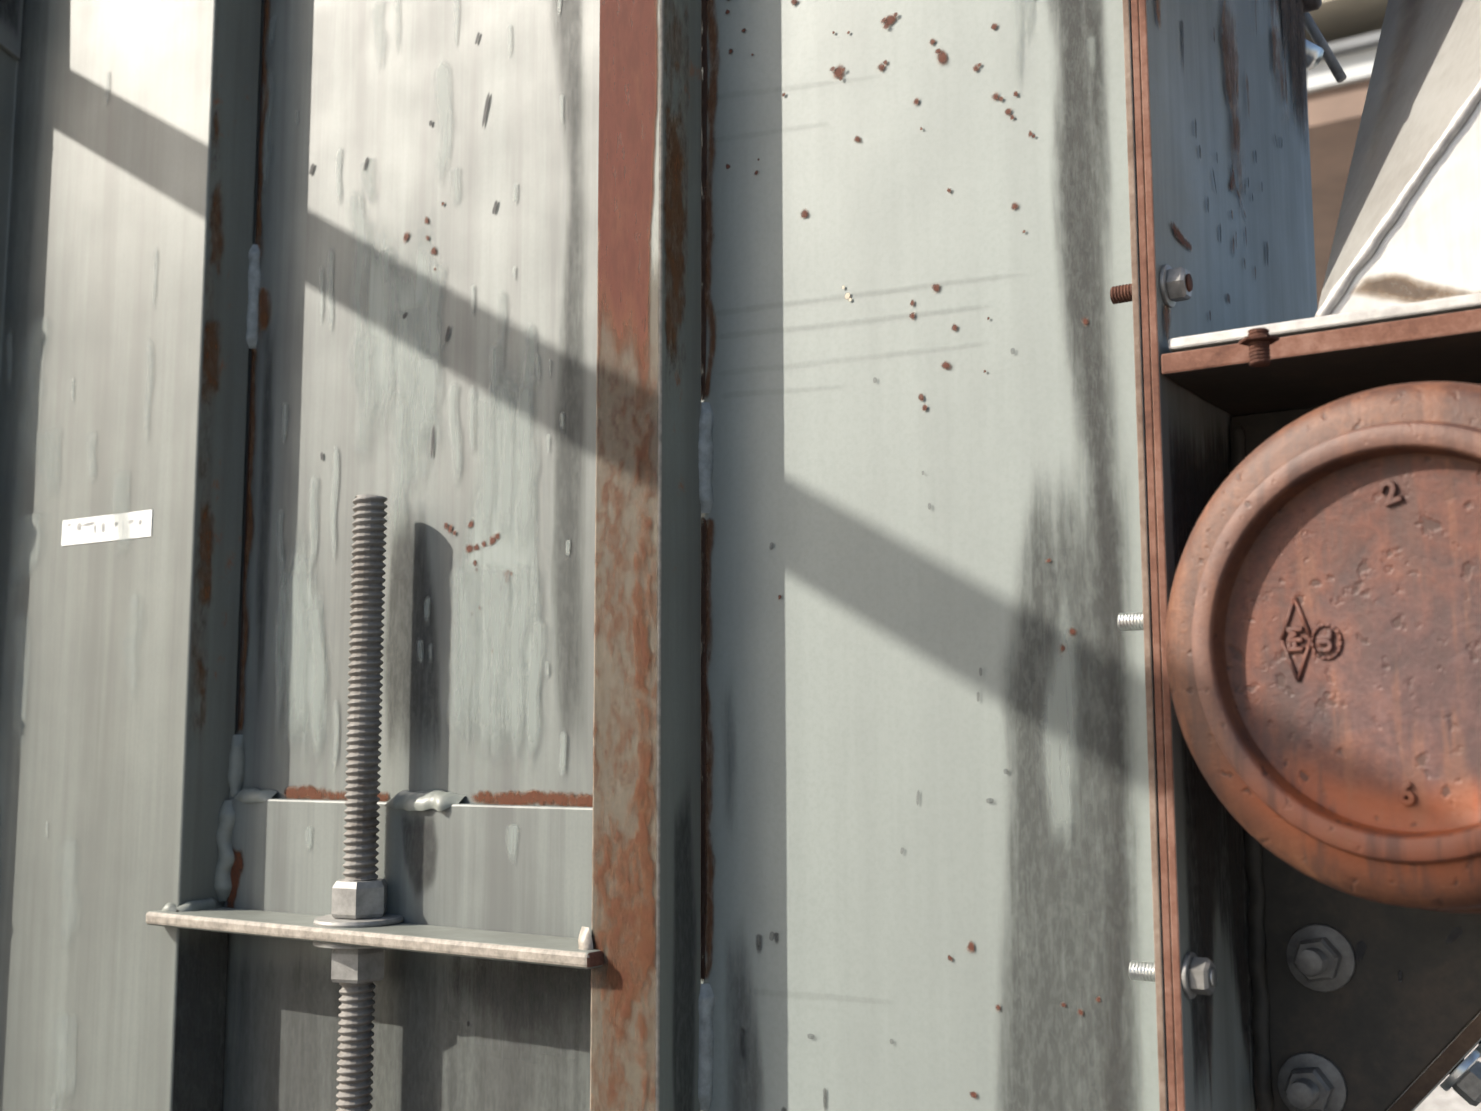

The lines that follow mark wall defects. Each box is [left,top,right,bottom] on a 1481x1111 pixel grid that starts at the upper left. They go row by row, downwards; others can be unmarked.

corrosion [881,13,897,29]
corrosion [930,39,946,64]
corrosion [830,65,845,80]
damp [1281,0,1307,131]
corrosion [1214,0,1256,279]
corrosion [594,0,733,1107]
damp [1008,0,1128,1111]
corrosion [284,785,347,800]
corrosion [473,790,593,807]